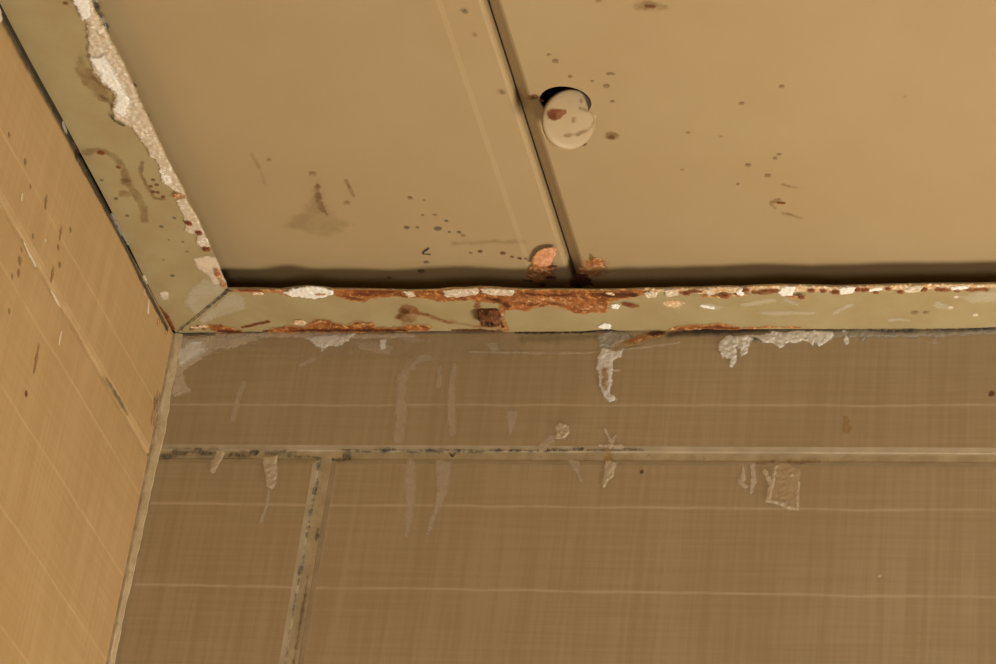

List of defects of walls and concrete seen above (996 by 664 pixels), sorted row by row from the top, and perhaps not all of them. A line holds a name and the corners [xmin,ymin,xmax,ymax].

rust [157,257,996,336]
rust [617,323,801,346]